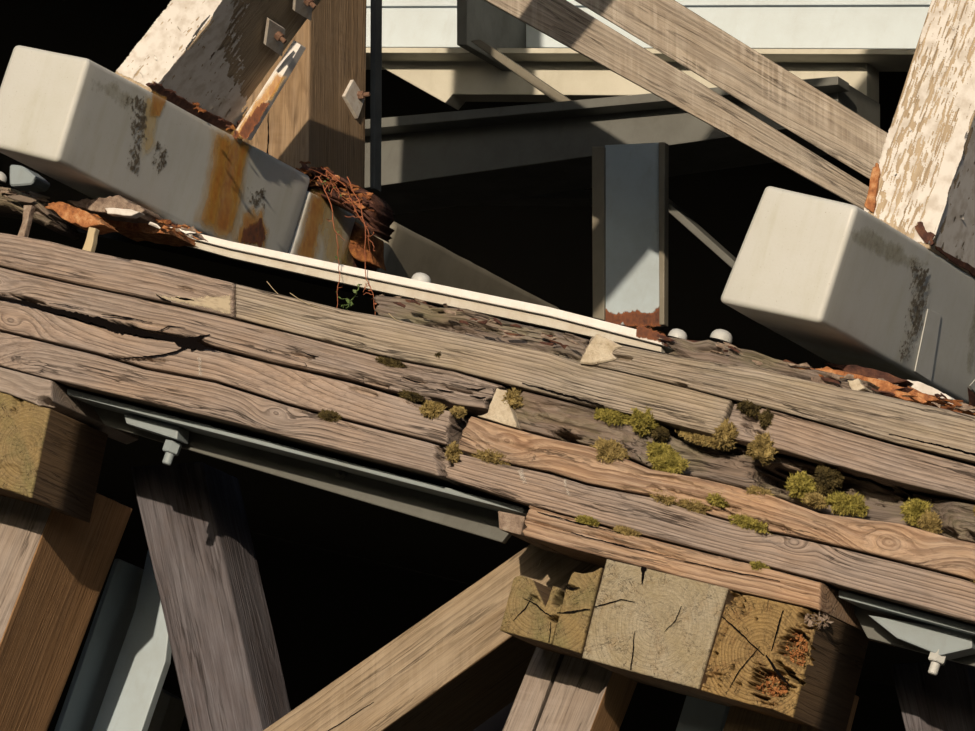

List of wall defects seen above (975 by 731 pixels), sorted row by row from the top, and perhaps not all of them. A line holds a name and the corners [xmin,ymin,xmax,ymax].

peeling [116,0,250,126]
rust [146,75,282,248]
peeling [864,0,975,268]
rust [915,222,975,277]
rust [605,307,665,342]
rust [816,363,975,416]